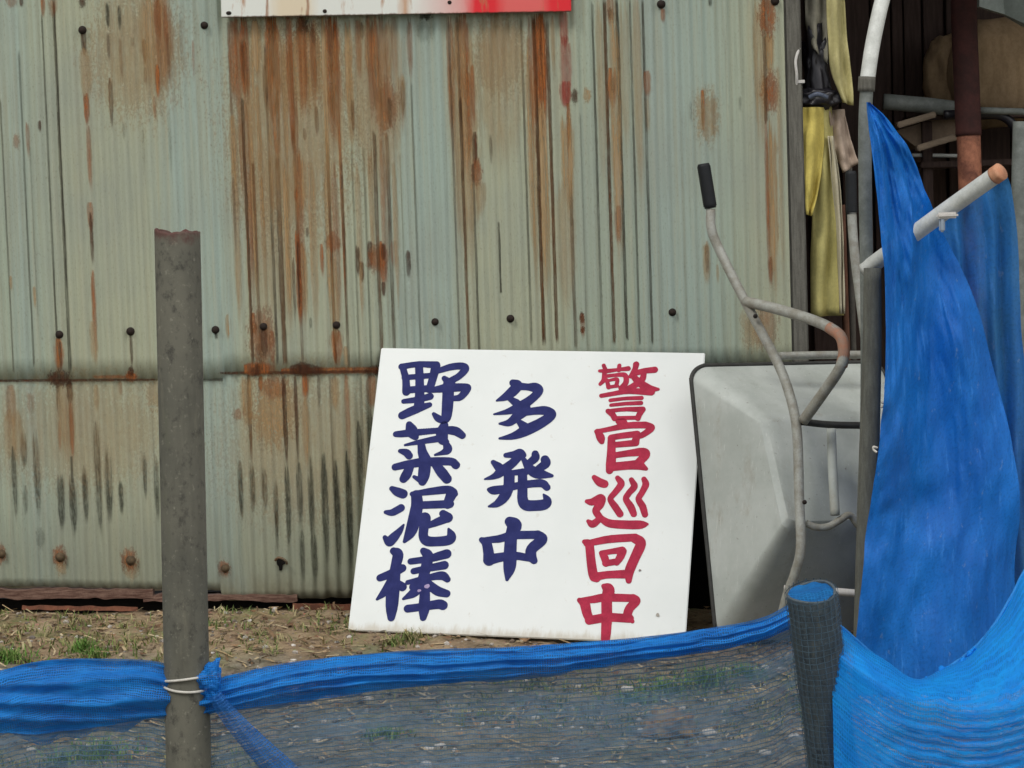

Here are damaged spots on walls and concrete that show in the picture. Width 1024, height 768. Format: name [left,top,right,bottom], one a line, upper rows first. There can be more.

corrosion [210,17,404,453]
corrosion [448,14,482,350]
corrosion [527,14,558,340]
corrosion [757,0,778,273]
corrosion [0,339,154,452]
damp [58,423,123,529]
damp [239,418,372,566]